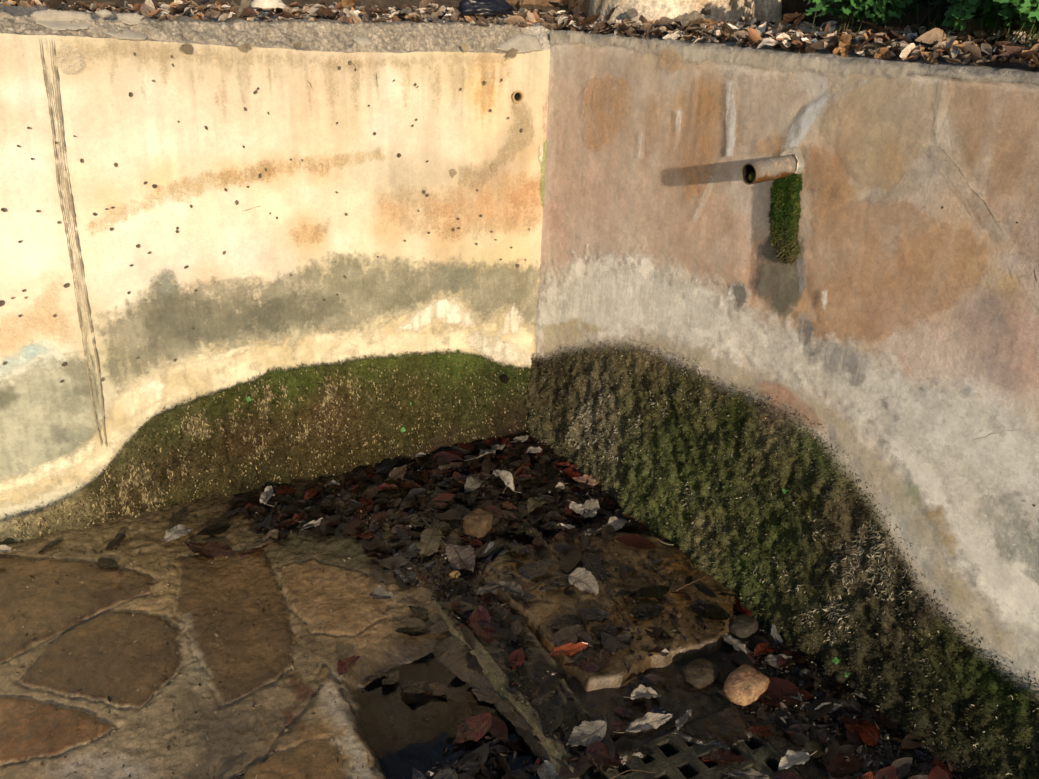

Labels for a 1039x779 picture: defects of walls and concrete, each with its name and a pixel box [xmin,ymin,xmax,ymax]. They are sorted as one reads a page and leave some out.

water stain [725,81,736,157]
water stain [785,96,829,155]
crack [932,80,1003,233]
water stain [0,236,1039,650]